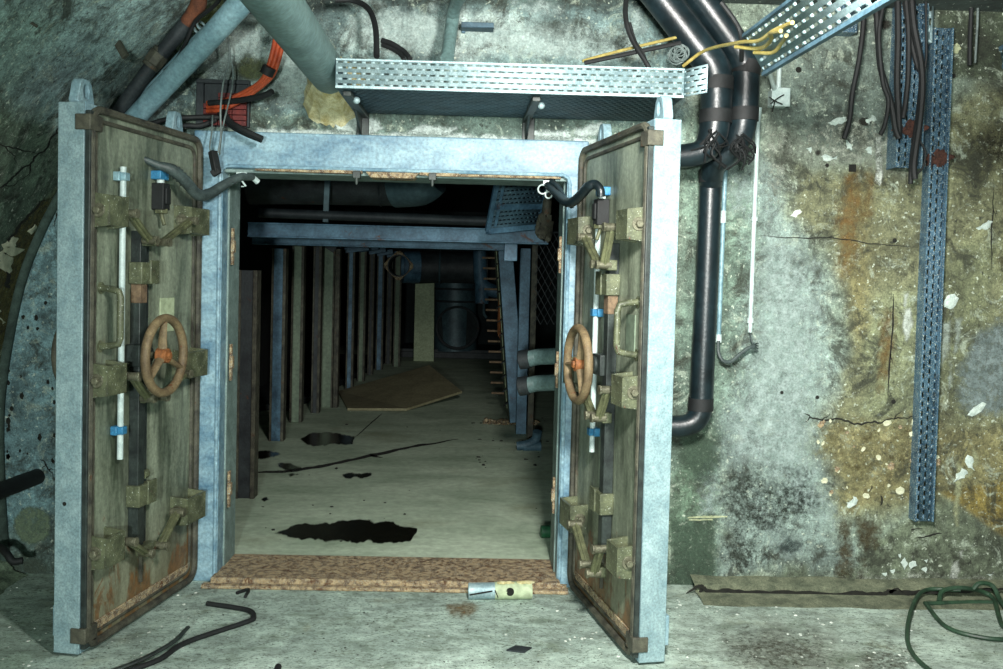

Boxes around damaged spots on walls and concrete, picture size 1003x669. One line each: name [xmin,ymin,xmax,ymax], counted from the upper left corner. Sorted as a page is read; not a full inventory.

crack [0,128,58,188]
flaking render [0,197,52,349]
crack [769,234,917,248]
crack [804,294,913,426]